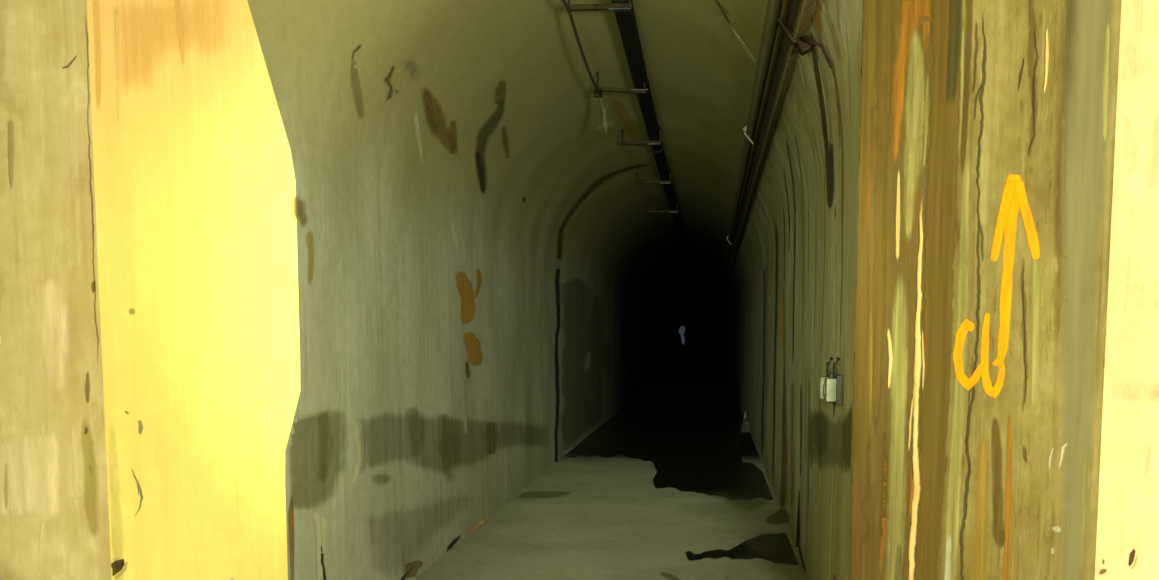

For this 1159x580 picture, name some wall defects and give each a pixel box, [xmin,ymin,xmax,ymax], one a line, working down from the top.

corrosion [423,90,456,153]
corrosion [812,0,843,222]
water stain [761,34,836,469]
corrosion [841,0,972,580]
crack [960,23,987,580]
corrosion [766,370,789,524]
corrosion [972,418,1014,580]